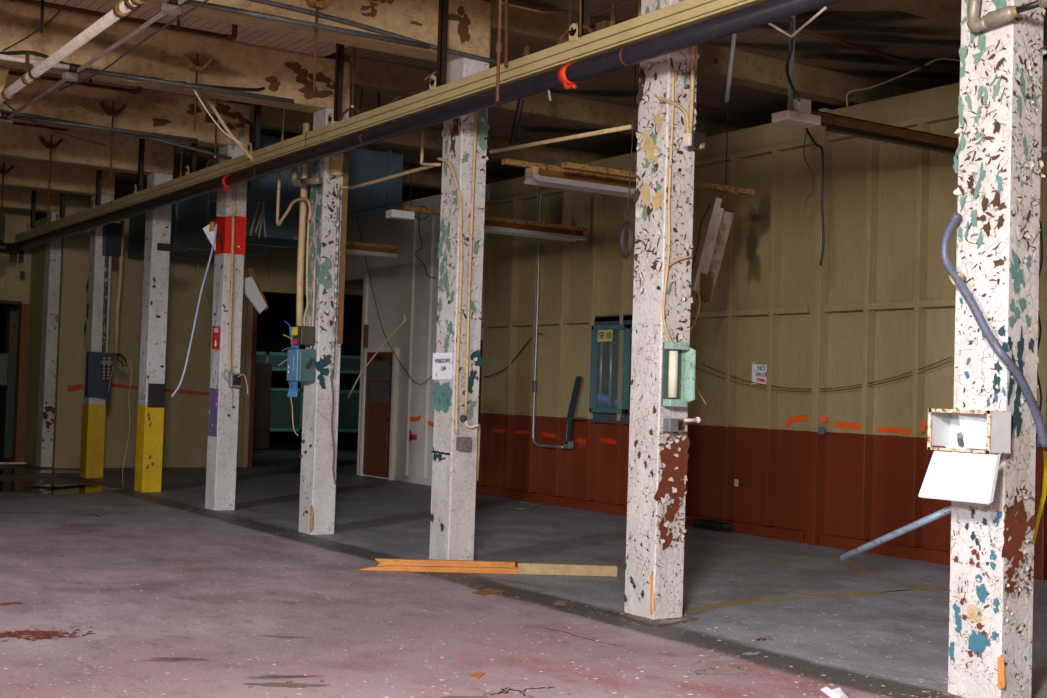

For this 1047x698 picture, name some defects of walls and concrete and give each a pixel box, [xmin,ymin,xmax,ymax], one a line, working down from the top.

peeling [265,76,281,92]
peeling [284,62,335,100]
peeling [360,0,394,18]
peeling [307,159,343,389]
peeling [432,109,490,420]
peeling [623,53,699,605]
peeling [953,0,1047,468]
peeling [948,485,1036,696]